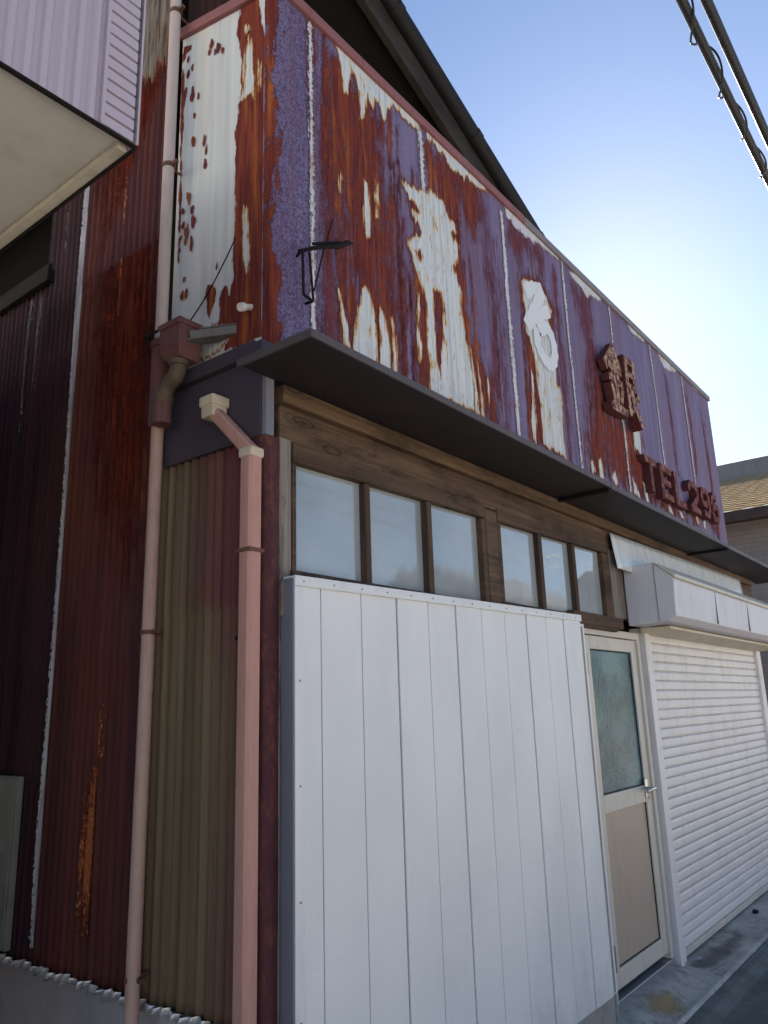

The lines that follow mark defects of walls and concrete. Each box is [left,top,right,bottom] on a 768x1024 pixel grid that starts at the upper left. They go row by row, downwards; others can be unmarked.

corrosion [177,45,207,264]
corrosion [205,0,285,351]
peeling [335,45,490,417]
corrosion [306,19,699,527]
peeling [500,207,649,503]
corrosion [686,397,714,494]
corrosion [75,689,106,944]